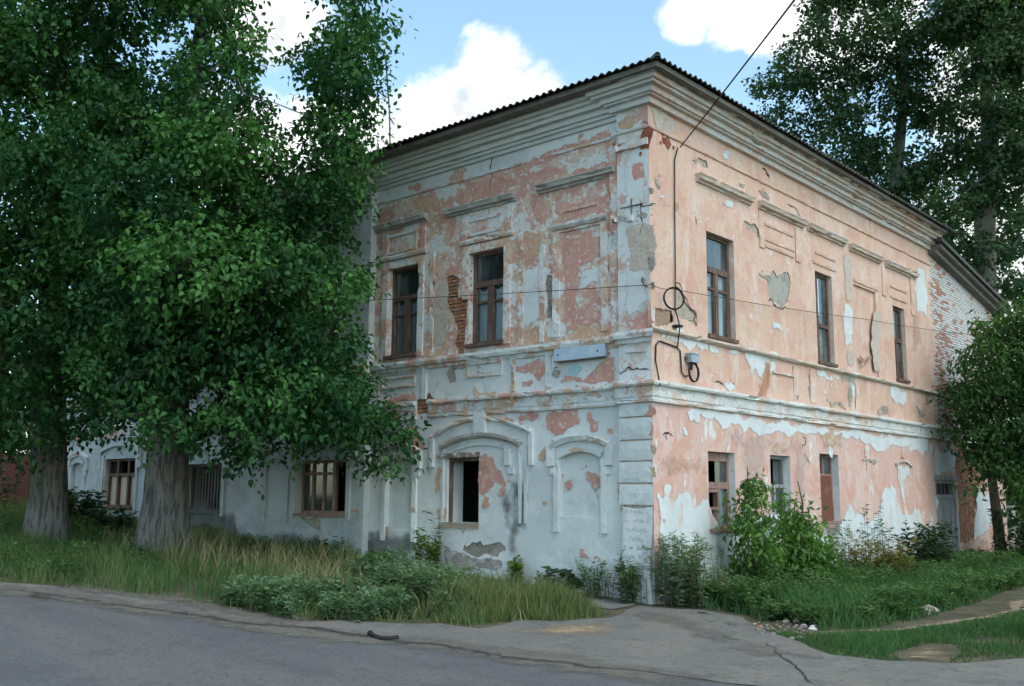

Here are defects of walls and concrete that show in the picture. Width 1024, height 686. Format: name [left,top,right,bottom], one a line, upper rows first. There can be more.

peeling [378,107,679,290]
flaking render [388,270,615,498]
peeling [822,428,842,458]
peeling [478,453,510,509]
peeling [445,549,502,570]